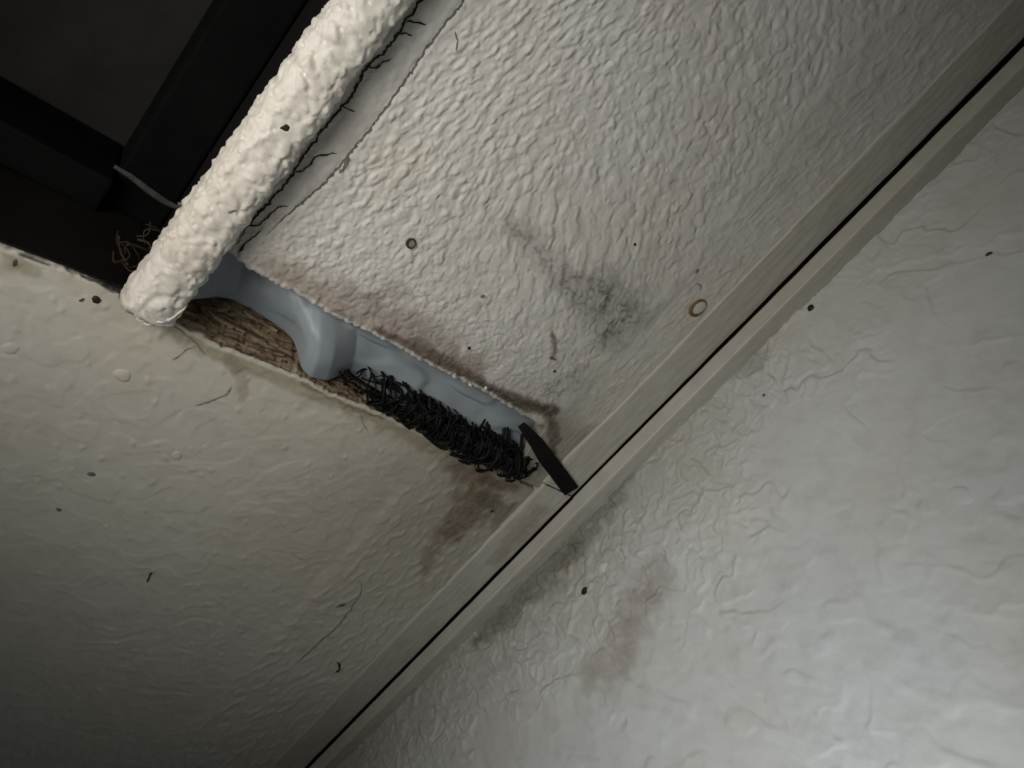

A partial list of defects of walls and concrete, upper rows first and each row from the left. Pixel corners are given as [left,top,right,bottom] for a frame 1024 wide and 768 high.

spalling [134,297,507,474]